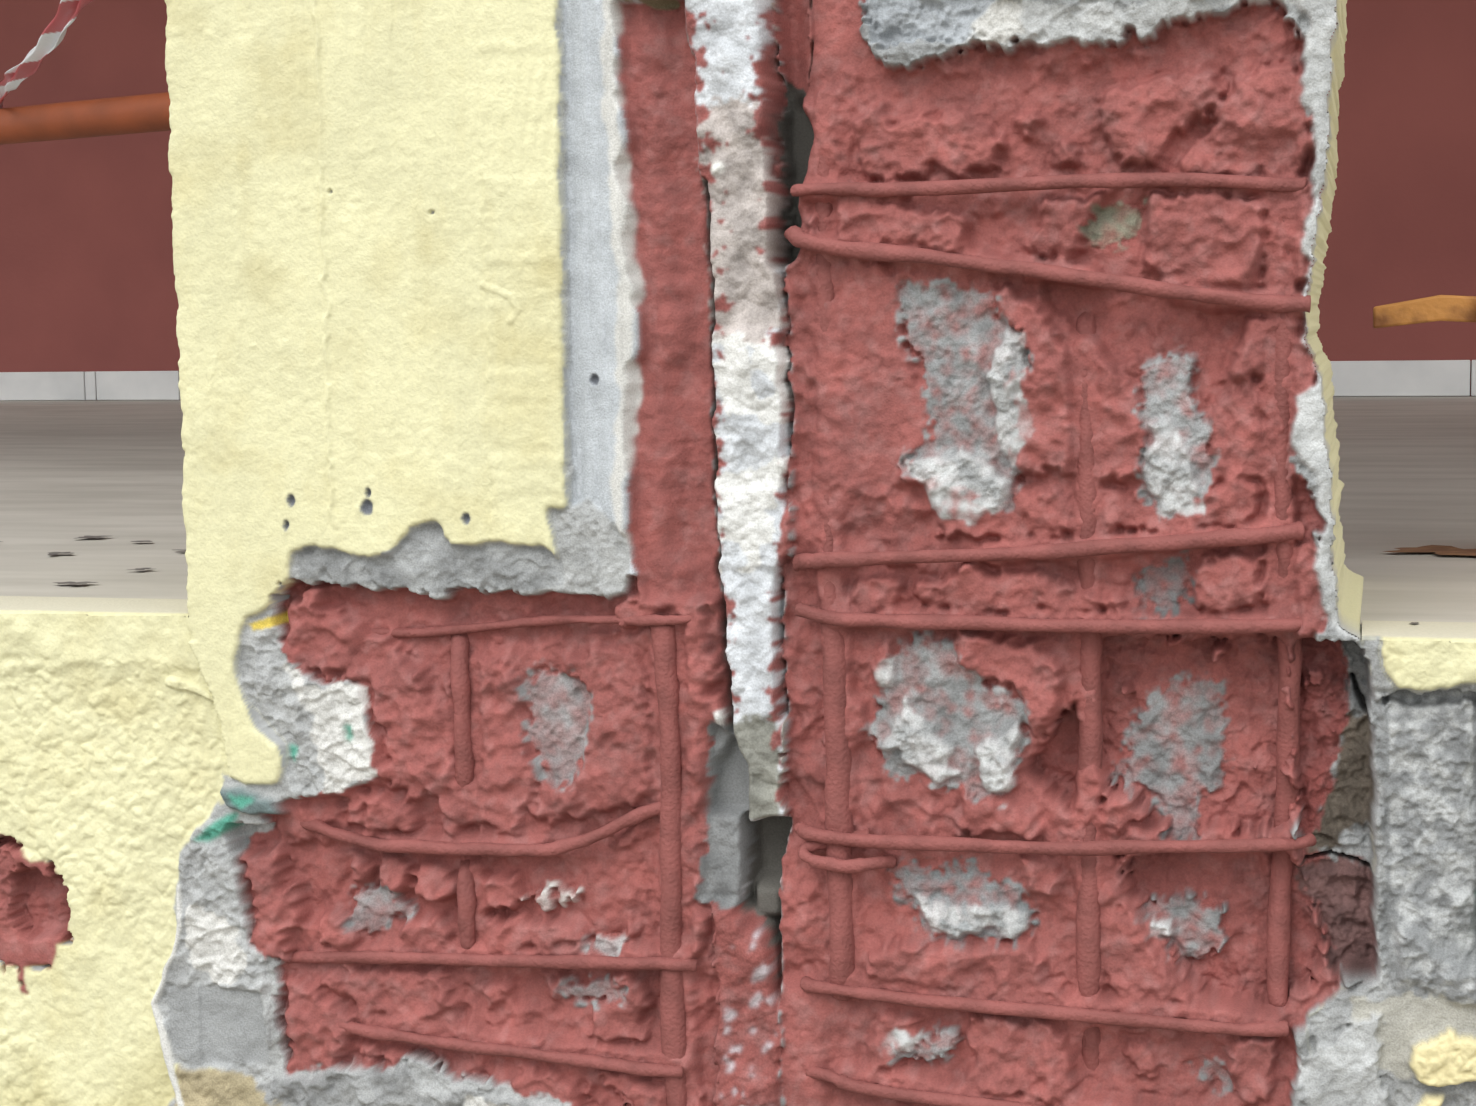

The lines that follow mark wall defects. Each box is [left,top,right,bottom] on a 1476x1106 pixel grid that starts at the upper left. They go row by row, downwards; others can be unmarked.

spalling [0,835,74,996]
spalling [157,0,734,1106]
spalling [772,0,1476,1106]